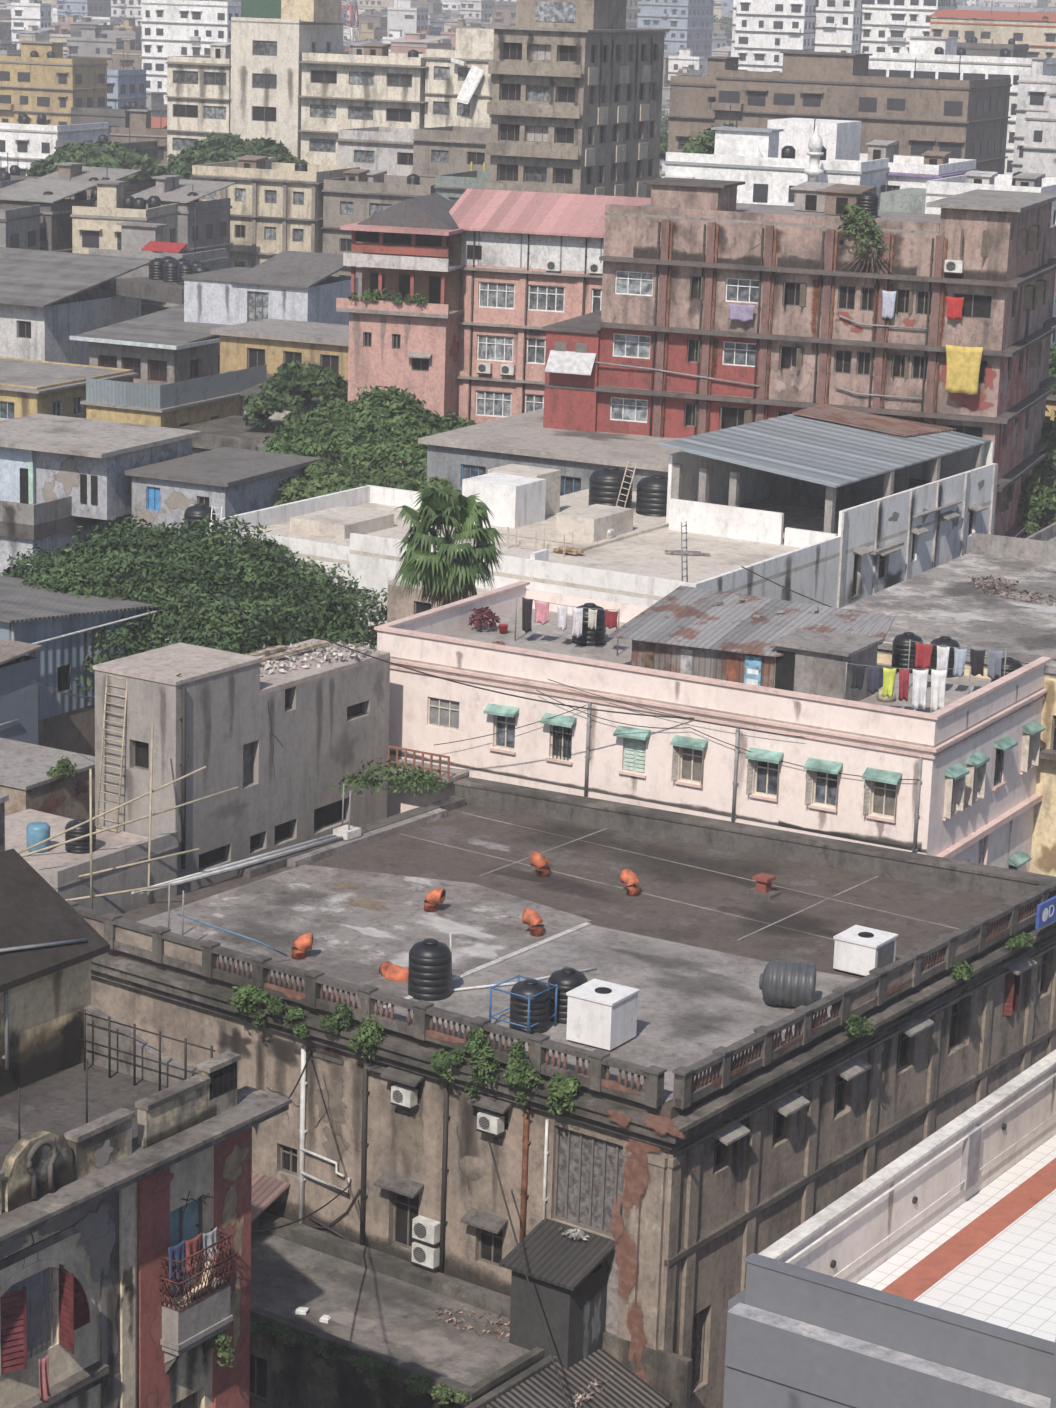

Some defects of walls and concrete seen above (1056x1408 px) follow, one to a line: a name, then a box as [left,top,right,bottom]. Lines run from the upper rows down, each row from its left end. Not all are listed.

water stain [633,223,917,276]
water stain [942,271,1007,281]
peeling [42,457,80,501]
water stain [221,1030,250,1056]
water stain [267,1036,342,1065]
spalling [93,1139,114,1168]
water stain [395,1110,423,1166]
peeling [222,1143,249,1256]
water stain [264,1201,412,1262]
water stain [436,1258,511,1297]
peeling [73,1201,121,1408]